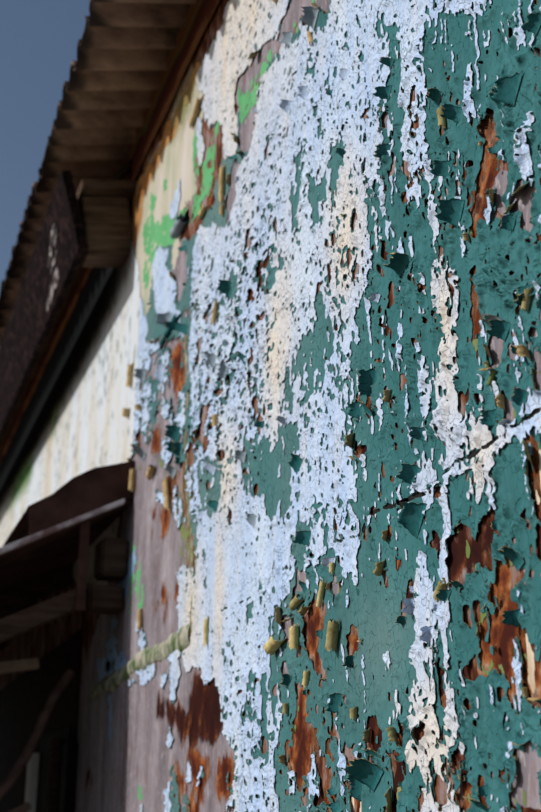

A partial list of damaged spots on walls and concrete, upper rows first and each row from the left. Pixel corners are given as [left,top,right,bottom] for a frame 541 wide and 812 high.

peeling [218,0,330,224]
peeling [372,85,392,133]
rust [434,71,523,243]
peeling [488,169,539,243]
peeling [478,282,541,430]
peeling [75,213,235,812]
crack [337,408,541,542]
rust [430,514,541,709]
rust [156,671,234,812]
rust [278,580,364,793]
rust [324,715,406,812]
peeling [509,738,541,809]